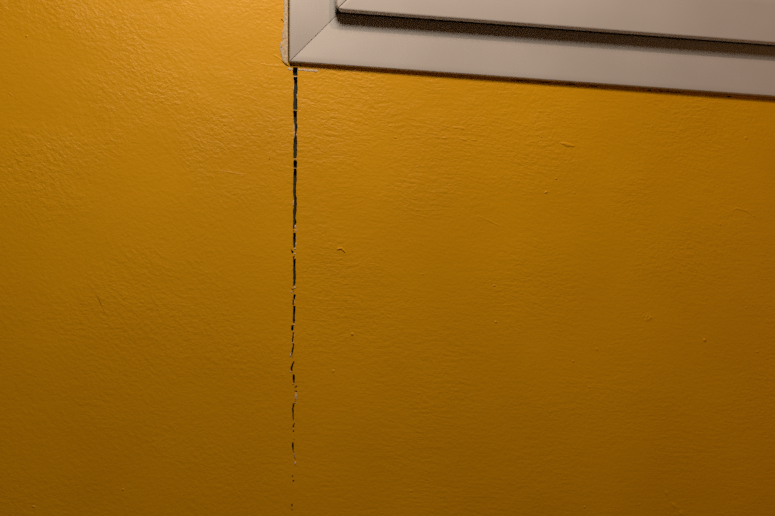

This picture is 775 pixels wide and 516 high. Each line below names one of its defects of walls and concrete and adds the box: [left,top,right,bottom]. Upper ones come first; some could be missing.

crack [282,61,301,482]